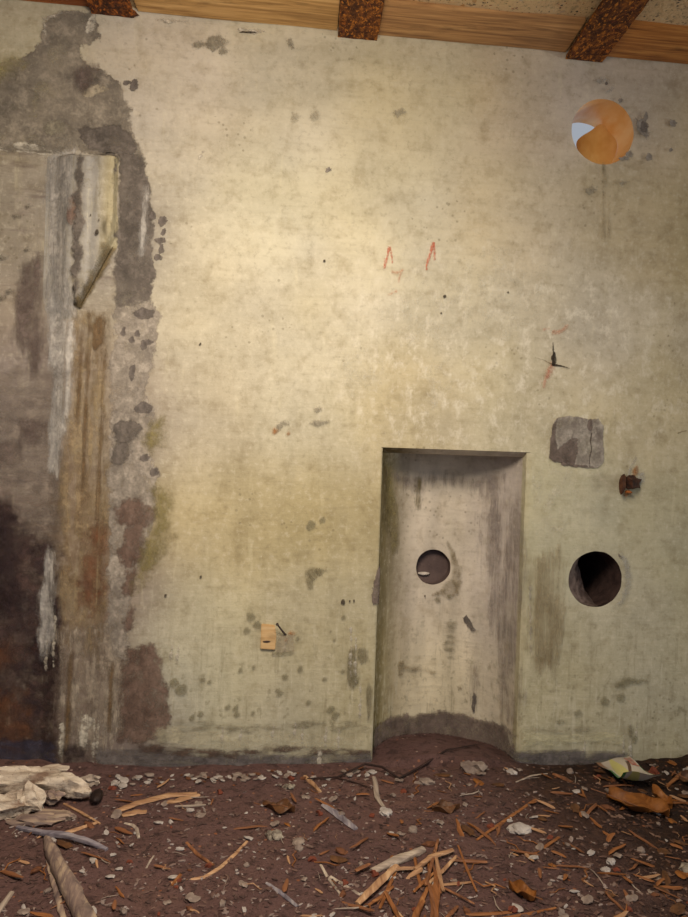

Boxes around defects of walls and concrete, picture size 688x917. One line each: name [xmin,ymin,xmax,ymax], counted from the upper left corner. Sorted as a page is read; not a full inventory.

crack [542,346,568,368]
water stain [0,141,637,767]
peeling [549,416,604,468]
corrosion [619,467,643,496]